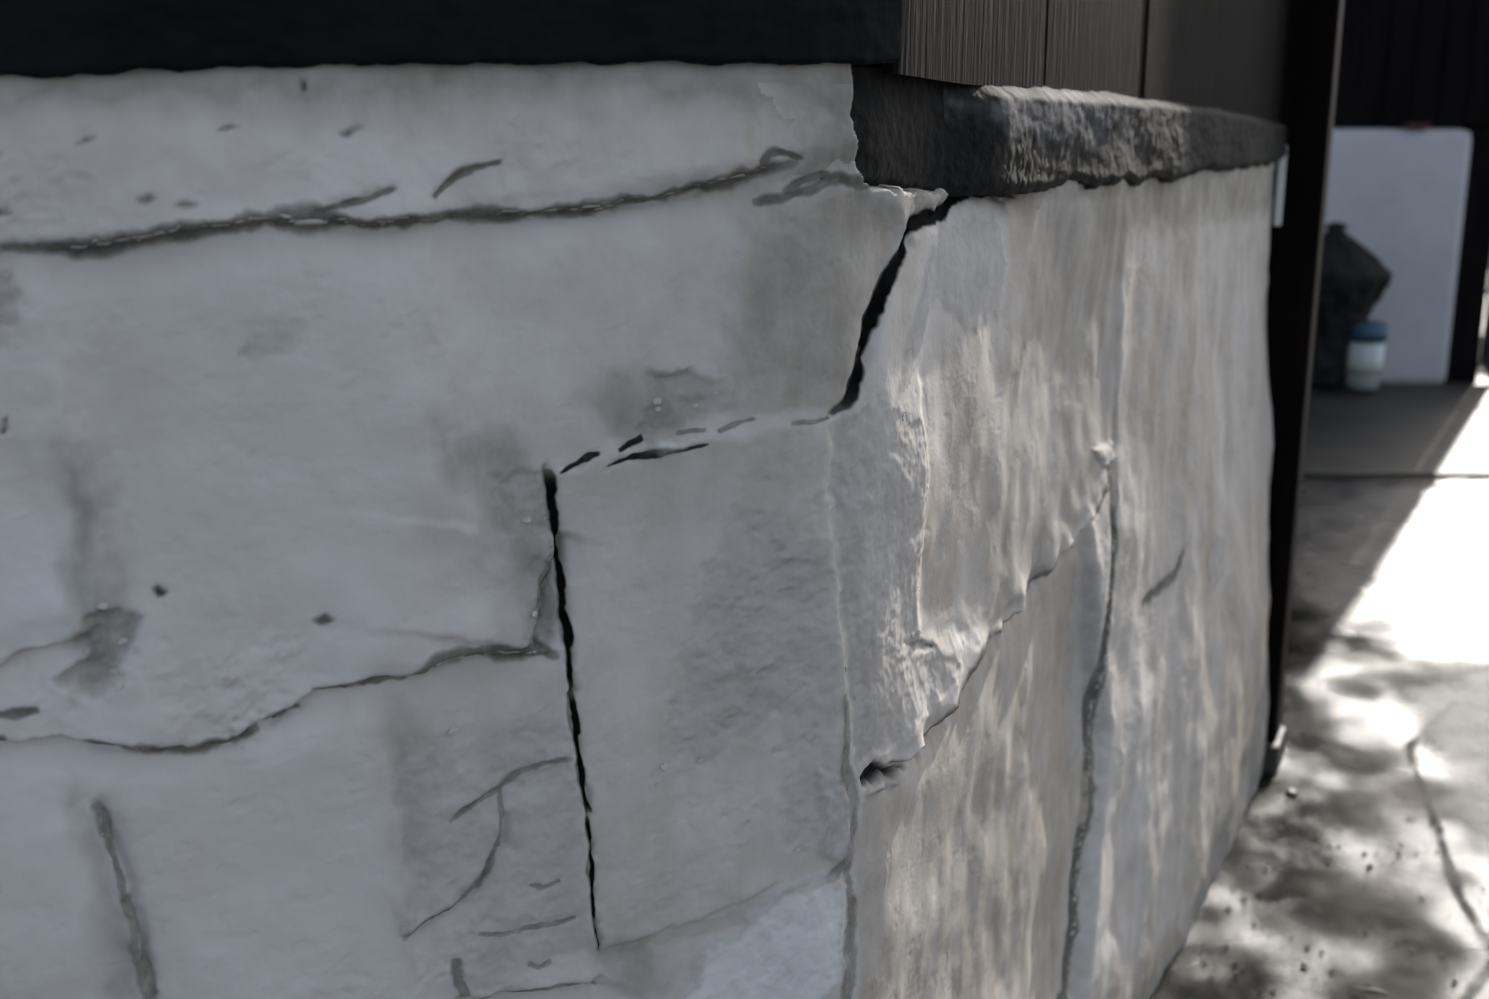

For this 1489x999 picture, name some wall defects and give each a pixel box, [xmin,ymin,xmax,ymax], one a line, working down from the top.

crack [24,147,870,257]
crack [792,195,1013,425]
crack [0,707,39,741]
crack [85,418,754,999]
crack [931,622,1003,728]
crack [1030,567,1055,582]
crack [828,697,858,999]
crack [1404,733,1489,999]